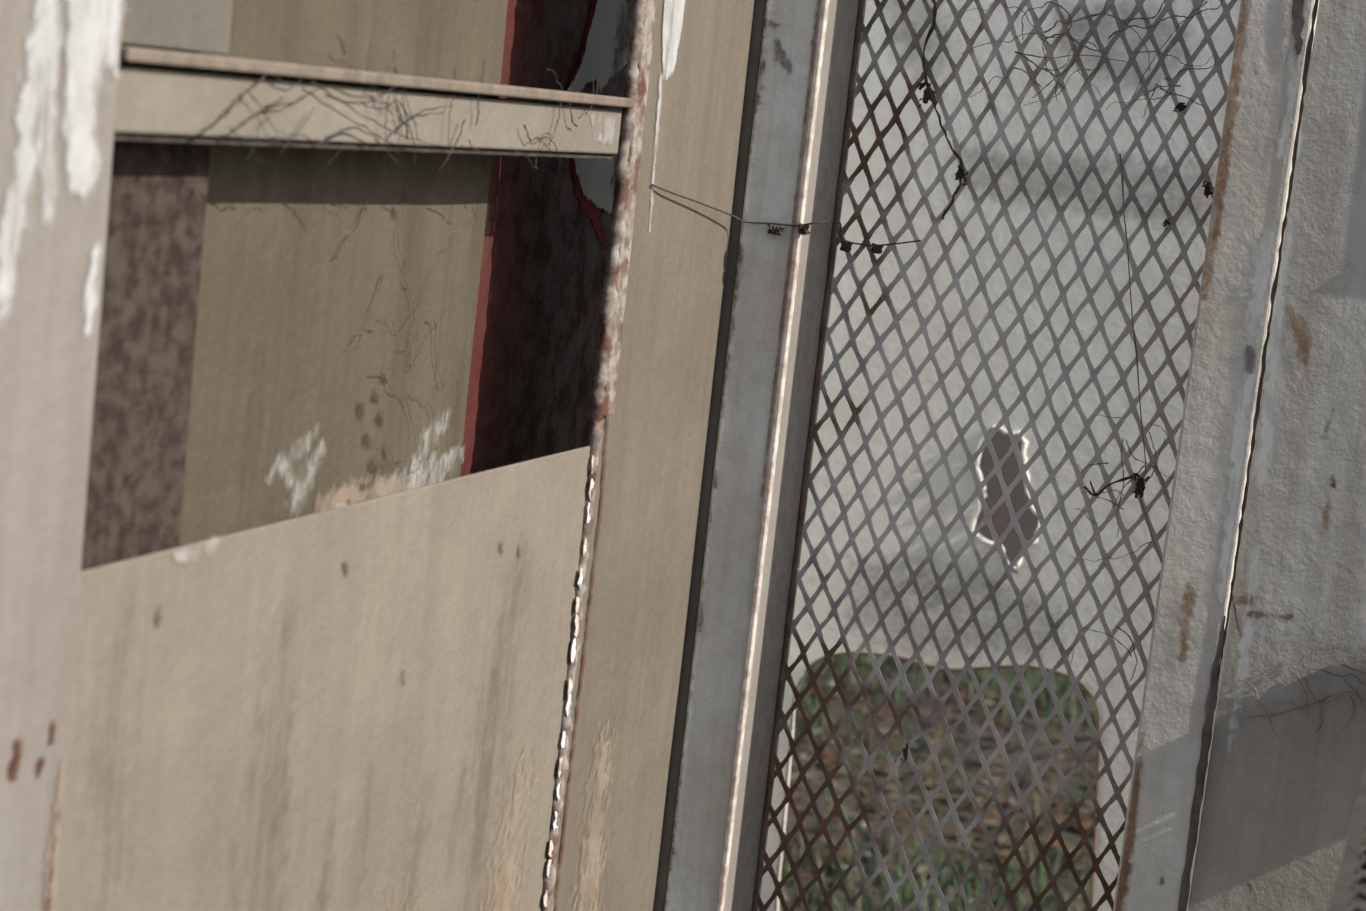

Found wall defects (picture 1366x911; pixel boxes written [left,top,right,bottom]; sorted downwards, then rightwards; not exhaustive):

peeling [566,0,634,93]
peeling [571,115,619,250]
rust [1202,0,1248,299]
rust [1287,309,1310,365]
peeling [1215,224,1294,752]
rust [554,417,611,911]
rust [1179,585,1194,661]
rust [9,739,22,780]
rust [38,723,56,776]
rust [45,761,65,911]
rust [1115,744,1142,911]